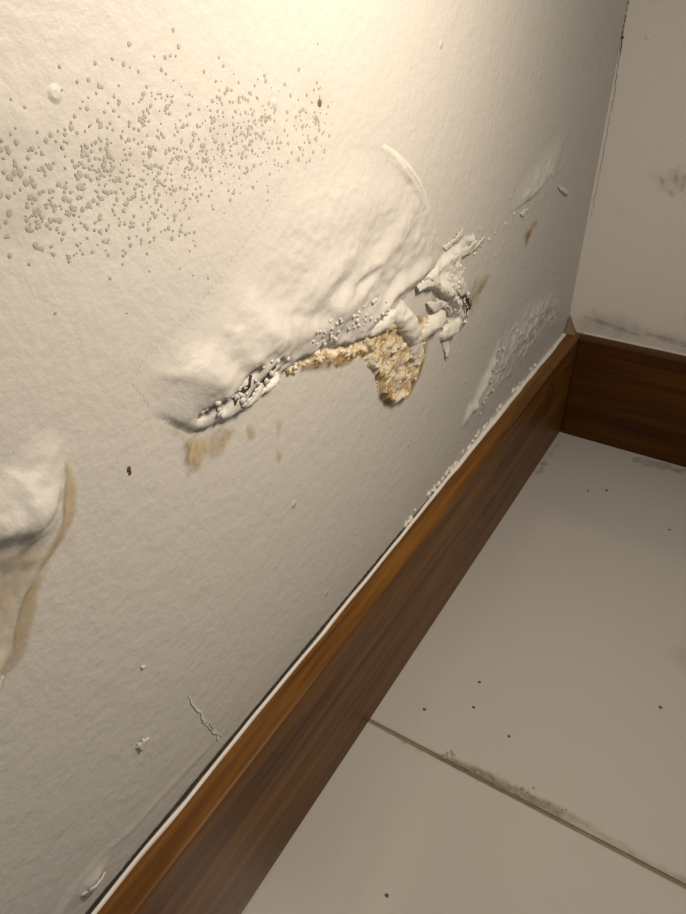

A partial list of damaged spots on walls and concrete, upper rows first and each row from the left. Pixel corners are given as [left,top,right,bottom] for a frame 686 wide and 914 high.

water stain [0,44,332,265]
spalling [285,229,486,409]
water stain [52,469,75,553]
water stain [15,582,40,644]